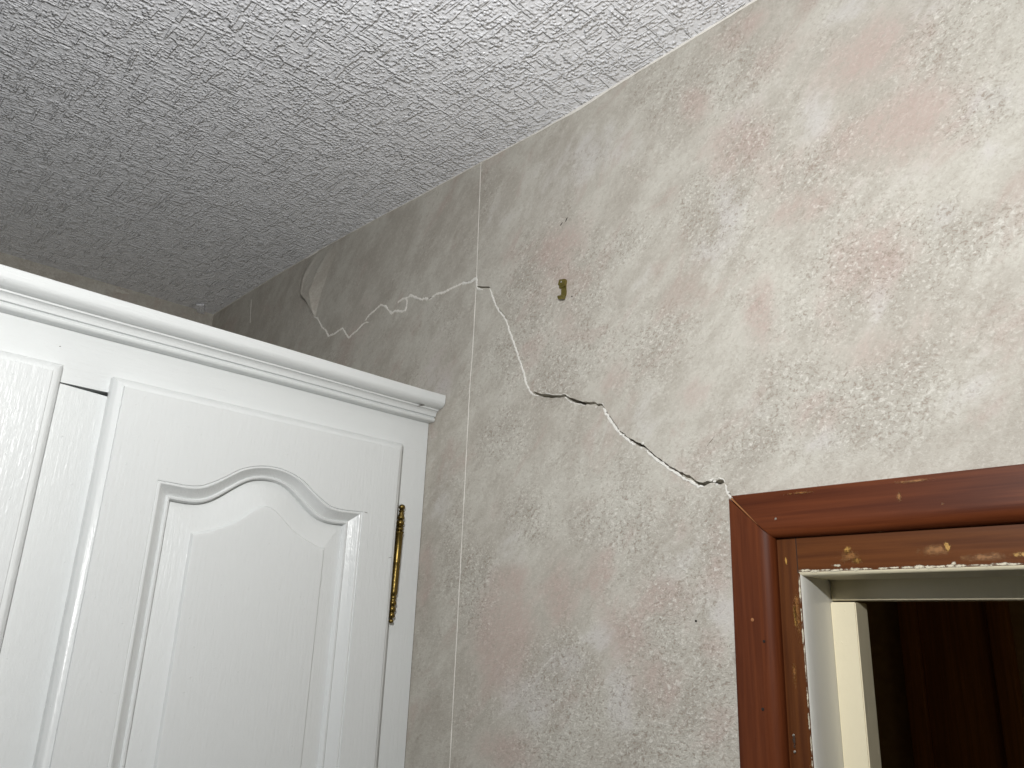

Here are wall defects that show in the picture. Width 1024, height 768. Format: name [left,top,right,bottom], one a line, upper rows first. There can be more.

crack [313,277,732,498]